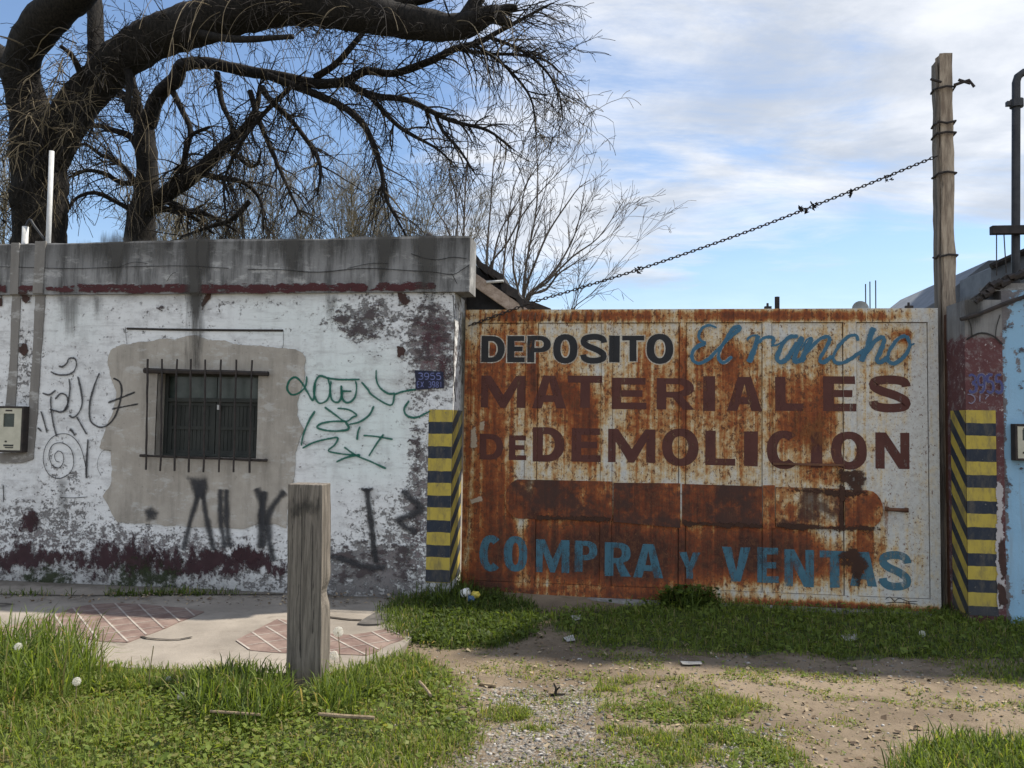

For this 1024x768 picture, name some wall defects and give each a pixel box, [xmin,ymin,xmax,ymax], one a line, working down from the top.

peeling [0,283,188,311]
water stain [101,235,130,273]
water stain [184,235,209,363]
water stain [280,233,304,276]
peeling [201,281,453,390]
water stain [365,232,393,278]
flaking render [0,335,306,584]
spalling [995,477,1013,609]